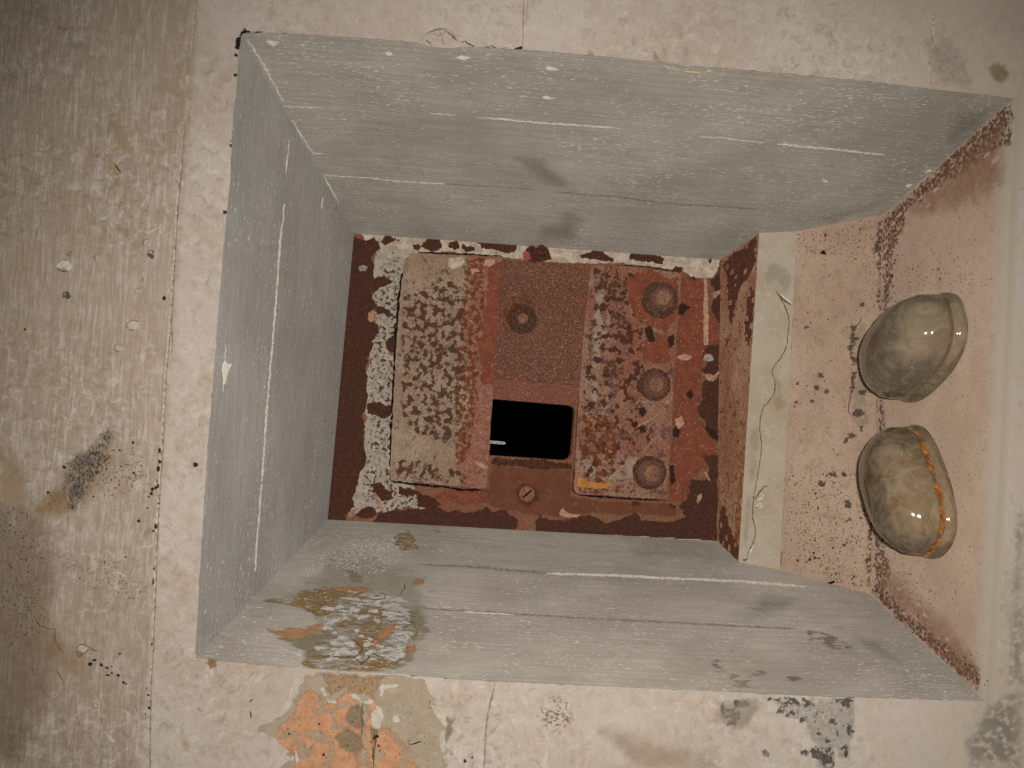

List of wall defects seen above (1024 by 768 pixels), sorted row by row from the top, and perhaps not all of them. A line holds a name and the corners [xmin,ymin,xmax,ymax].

rust [897,106,1011,208]
rust [328,236,757,530]
rust [535,447,745,559]
crack [743,291,792,561]
rust [903,426,946,556]
peeling [263,531,429,724]
rust [877,537,980,689]